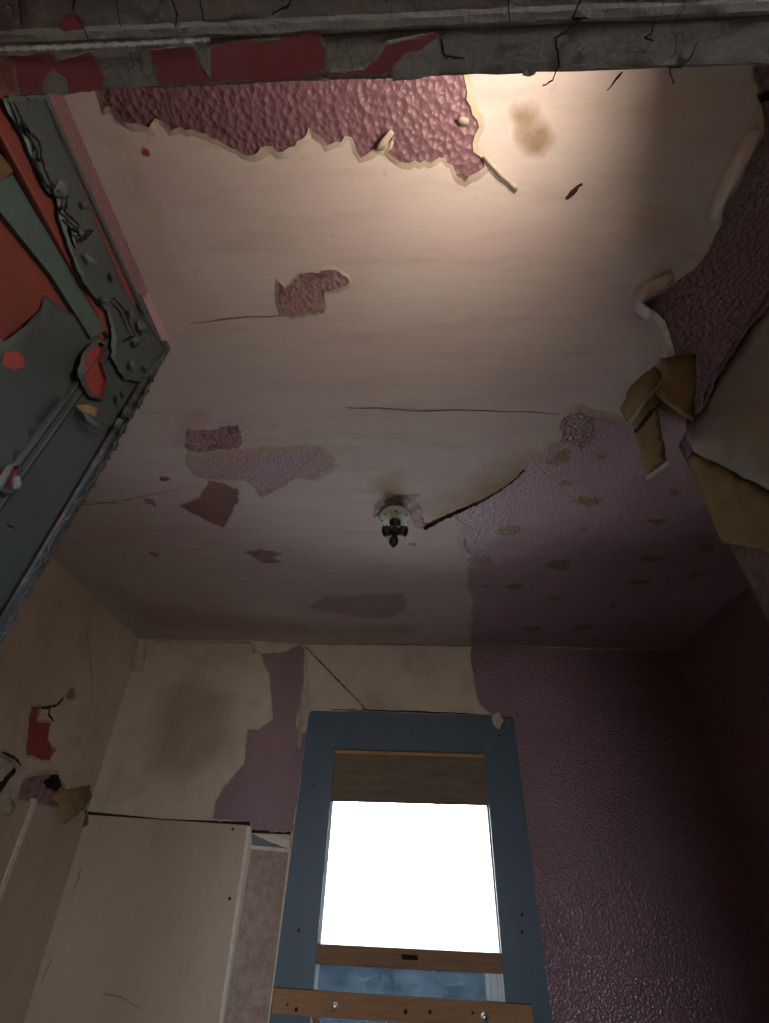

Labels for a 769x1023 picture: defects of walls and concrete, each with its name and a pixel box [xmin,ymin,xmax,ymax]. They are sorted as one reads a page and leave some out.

crack [440,38,465,60]
crack [543,0,588,86]
crack [667,41,699,84]
leakage [502,92,563,165]
peeling [0,13,490,461]
peeling [642,64,769,416]
crack [347,407,558,415]
peeling [0,462,20,494]
peeling [178,424,340,528]
peeling [372,494,430,529]
crack [423,470,525,530]
peeling [15,703,66,808]